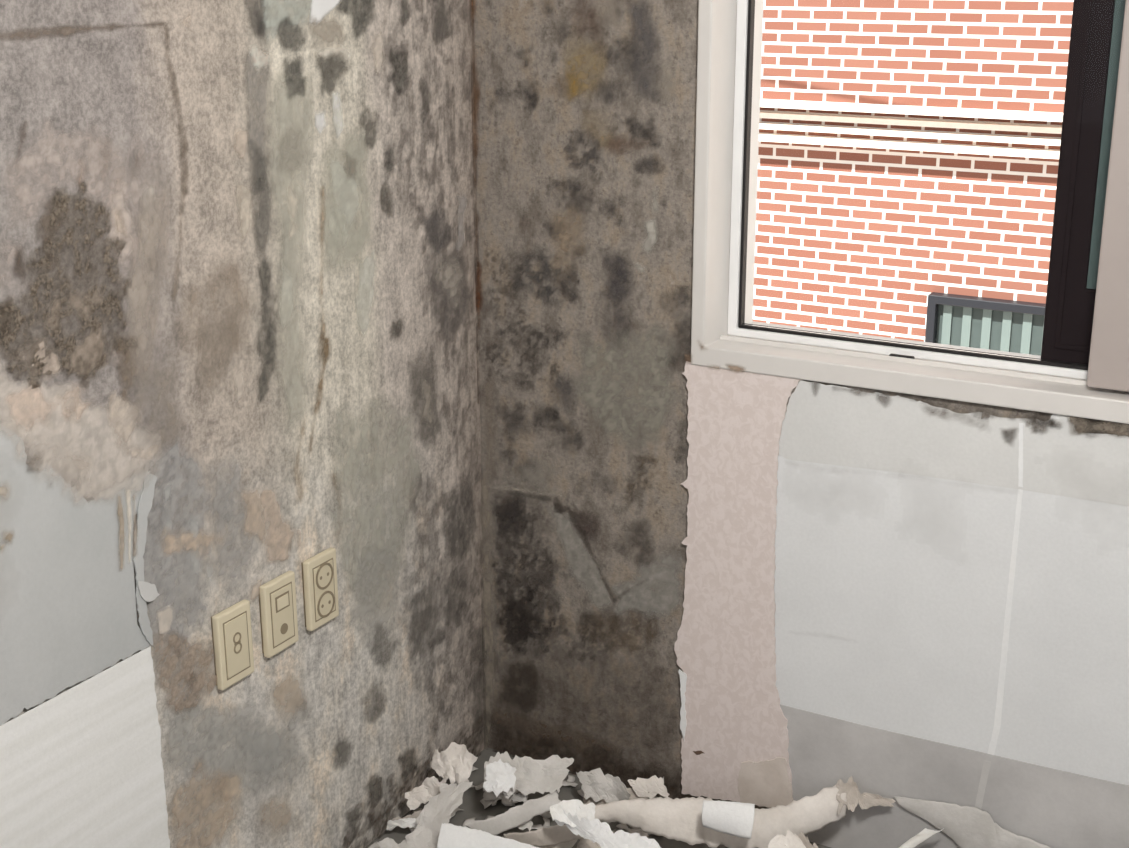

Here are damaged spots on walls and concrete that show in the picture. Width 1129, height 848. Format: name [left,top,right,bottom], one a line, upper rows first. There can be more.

crack [0,23,168,40]
leakage [251,0,266,35]
leakage [279,0,375,94]
leakage [391,52,408,101]
rust [471,69,479,183]
leakage [247,52,275,401]
leakage [381,150,393,215]
peeling [0,132,252,643]
spalling [1069,416,1129,436]
leakage [490,494,656,662]
leakage [343,749,442,848]
leakage [454,716,680,799]